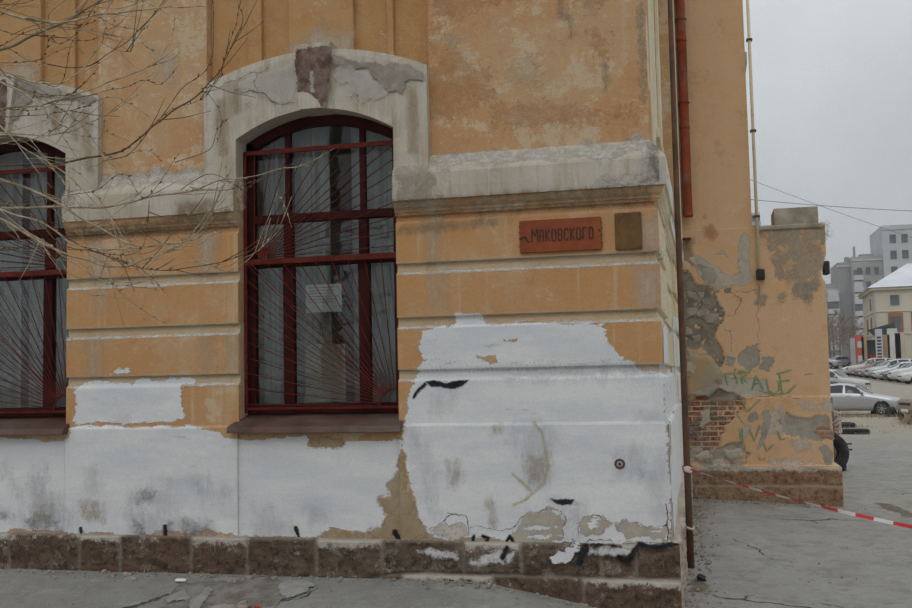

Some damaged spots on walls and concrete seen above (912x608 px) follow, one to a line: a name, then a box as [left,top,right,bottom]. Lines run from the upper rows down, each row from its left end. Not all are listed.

flaking render [0,79,97,132]
crack [214,67,291,105]
flaking render [294,46,424,106]
crack [685,286,760,352]
flaking render [683,233,835,470]
flaking render [417,522,469,560]
flaking render [469,506,674,567]